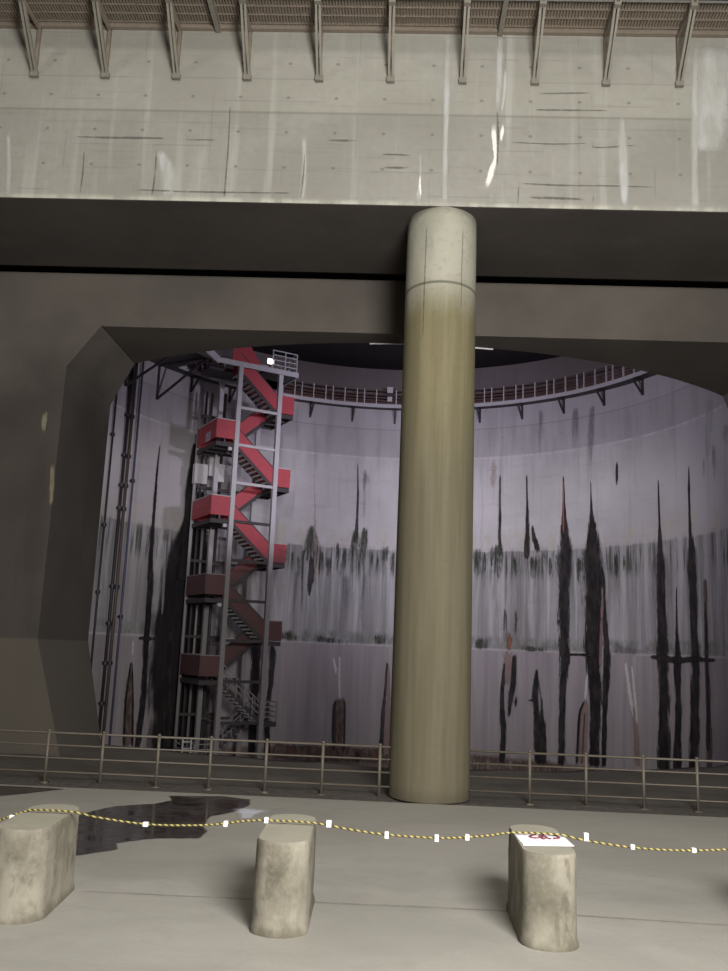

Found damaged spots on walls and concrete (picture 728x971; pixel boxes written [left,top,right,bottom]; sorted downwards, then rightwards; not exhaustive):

water stain [692,52,728,204]
water stain [135,444,212,752]
water stain [472,476,611,772]
water stain [651,466,715,769]